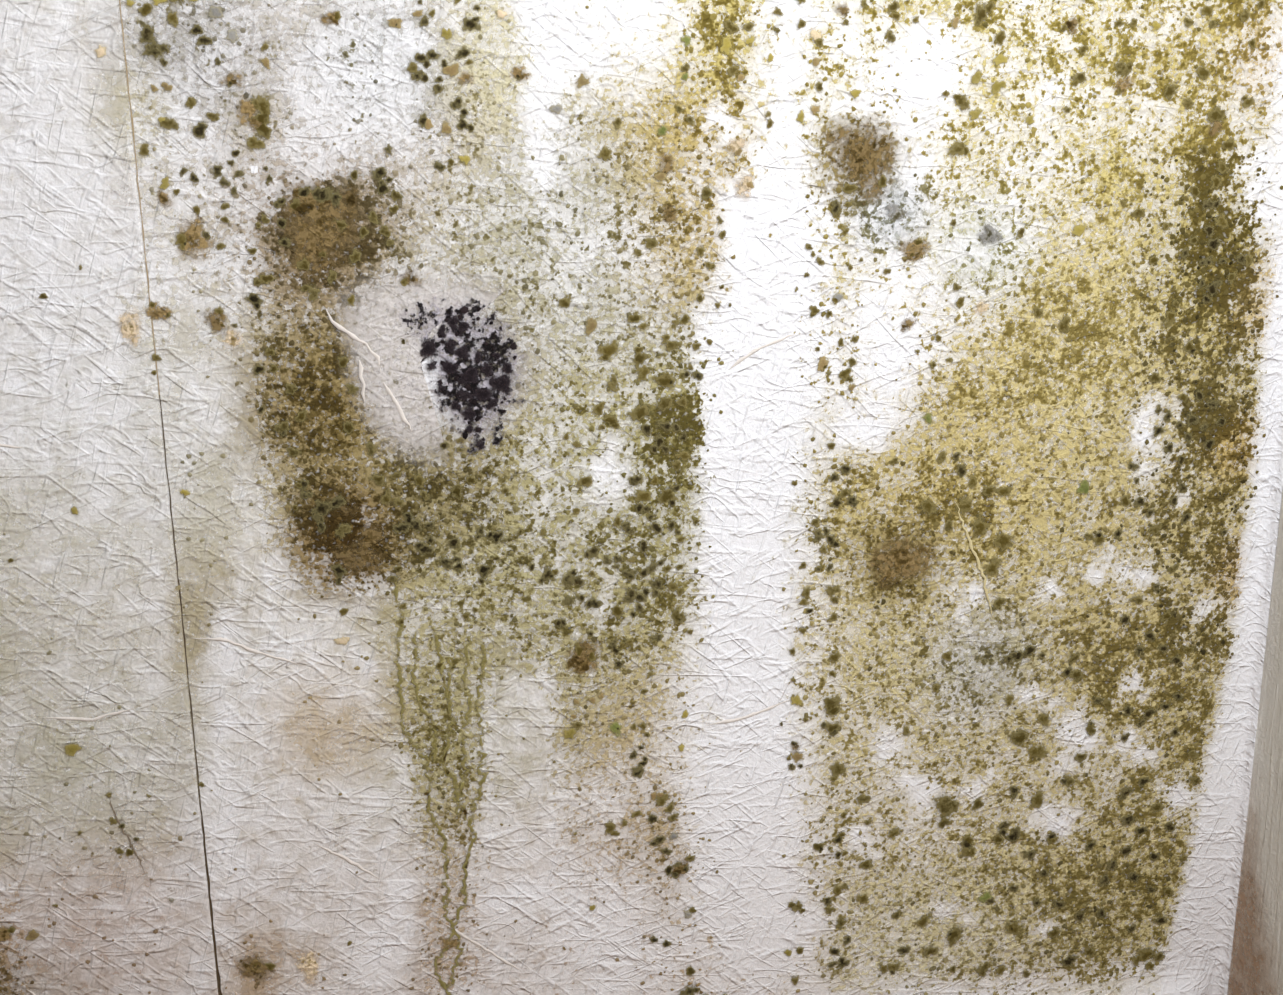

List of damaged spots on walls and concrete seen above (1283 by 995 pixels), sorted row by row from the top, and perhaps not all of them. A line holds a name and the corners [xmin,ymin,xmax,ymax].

leakage [0,480,182,995]
leakage [95,0,787,995]
leakage [780,0,1283,995]